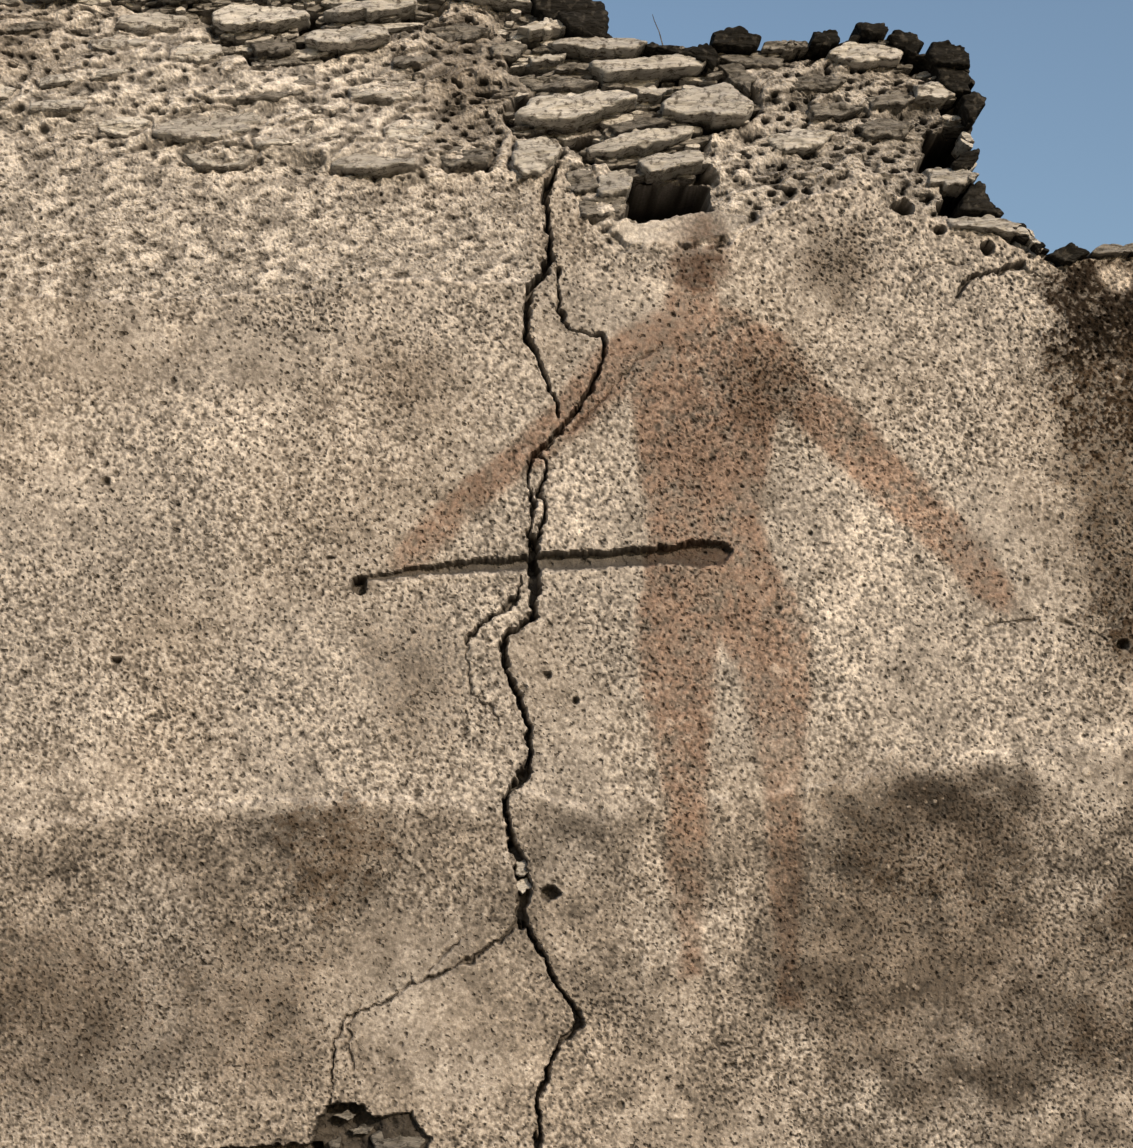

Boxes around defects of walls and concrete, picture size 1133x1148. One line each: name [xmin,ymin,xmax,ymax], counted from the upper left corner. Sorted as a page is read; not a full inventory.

spalling [918,132,955,172]
spalling [936,197,959,218]
damp [1035,256,1133,468]
crack [326,161,664,1148]
spalling [309,1100,434,1148]